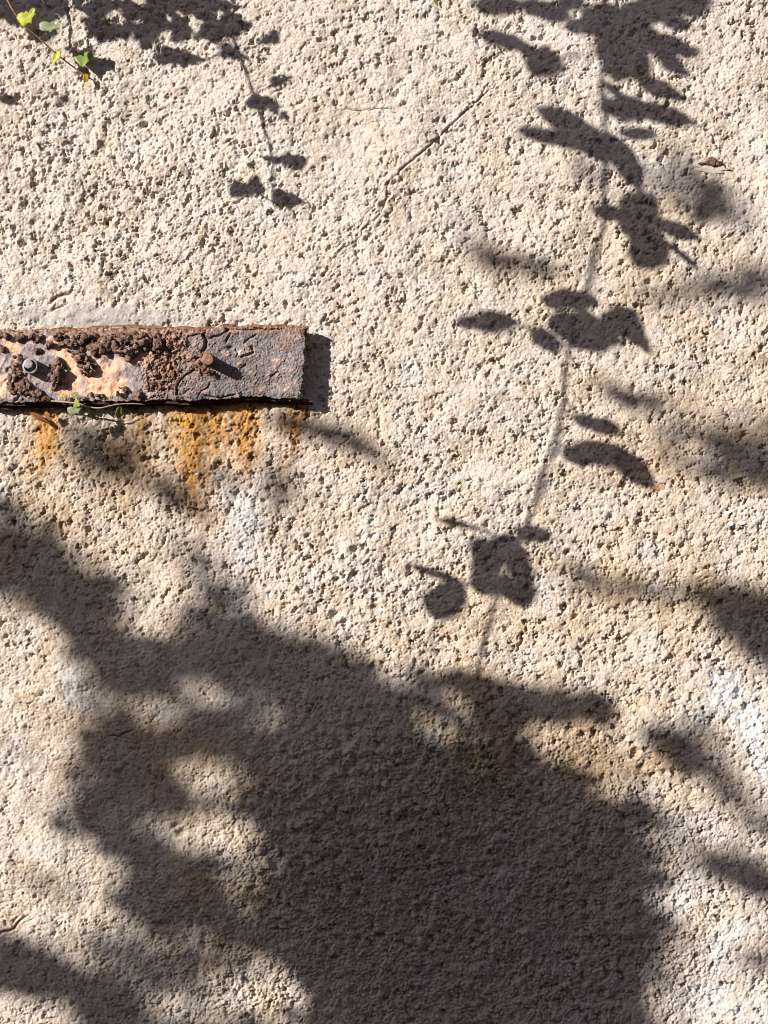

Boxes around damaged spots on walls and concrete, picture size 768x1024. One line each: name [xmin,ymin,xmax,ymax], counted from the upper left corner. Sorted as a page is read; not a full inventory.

rust [0,323,313,486]